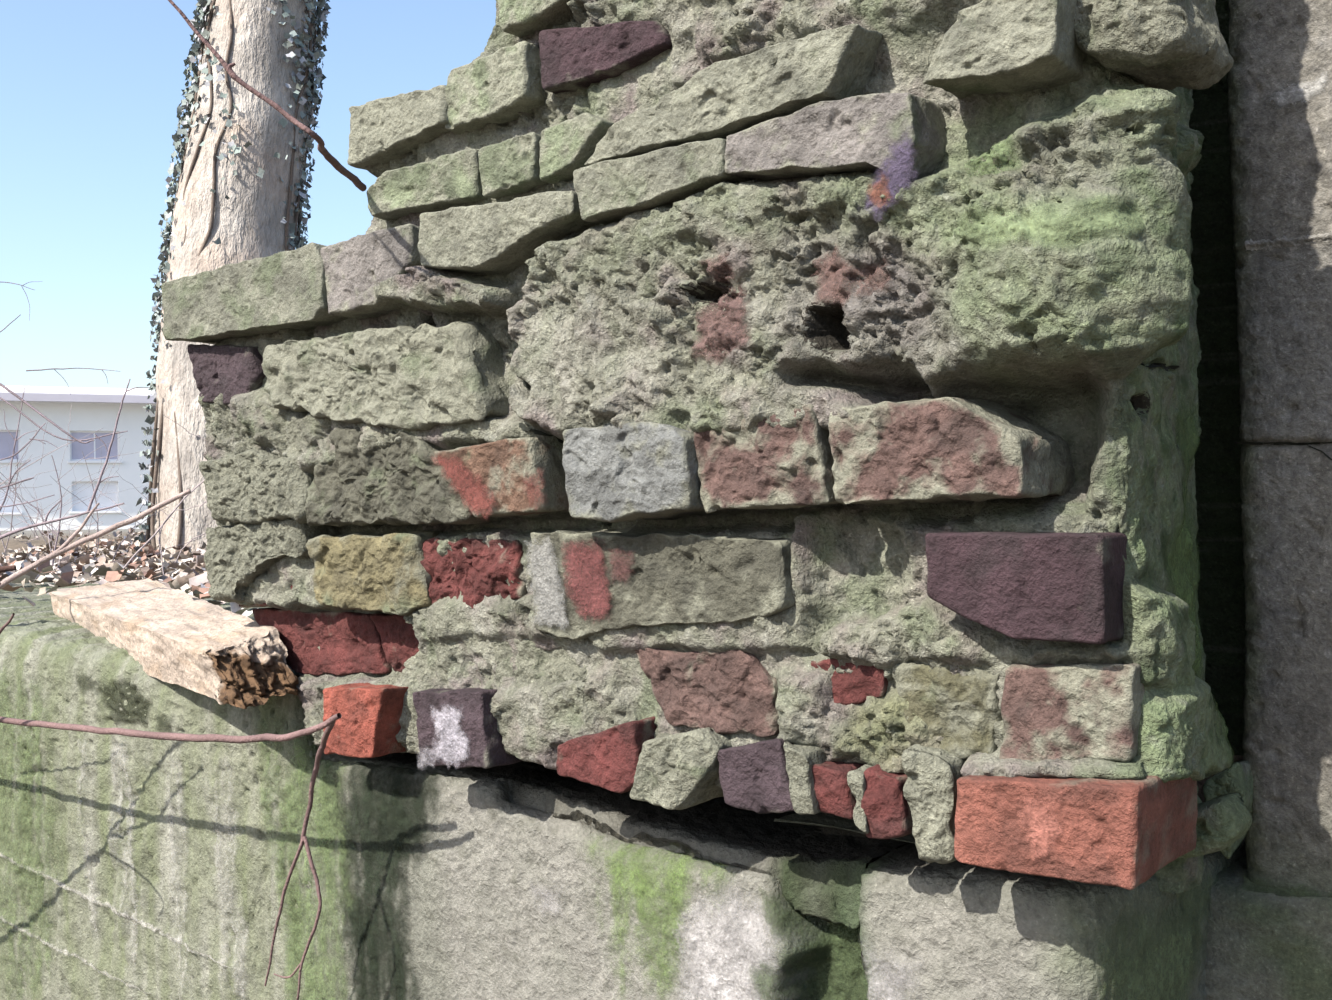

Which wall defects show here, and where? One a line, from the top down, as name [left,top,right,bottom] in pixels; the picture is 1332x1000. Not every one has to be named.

damp [320,708,468,1000]